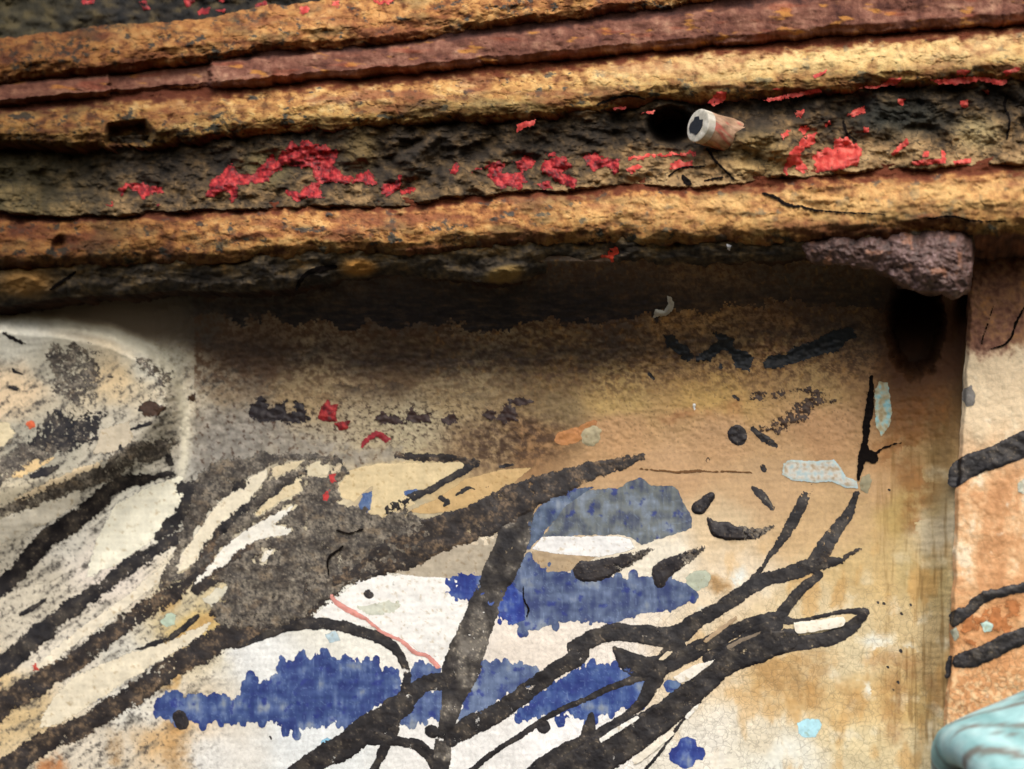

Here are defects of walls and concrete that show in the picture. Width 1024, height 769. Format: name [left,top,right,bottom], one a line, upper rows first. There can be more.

rust [0,0,1024,156]
peeling [930,67,1021,95]
peeling [516,119,536,133]
peeling [764,69,862,176]
peeling [205,140,416,203]
peeling [472,152,577,191]
peeling [583,150,696,175]
peeling [106,182,164,207]
rust [0,156,1024,270]
crack [762,192,886,216]
crack [928,215,1006,223]
leakage [166,254,922,414]